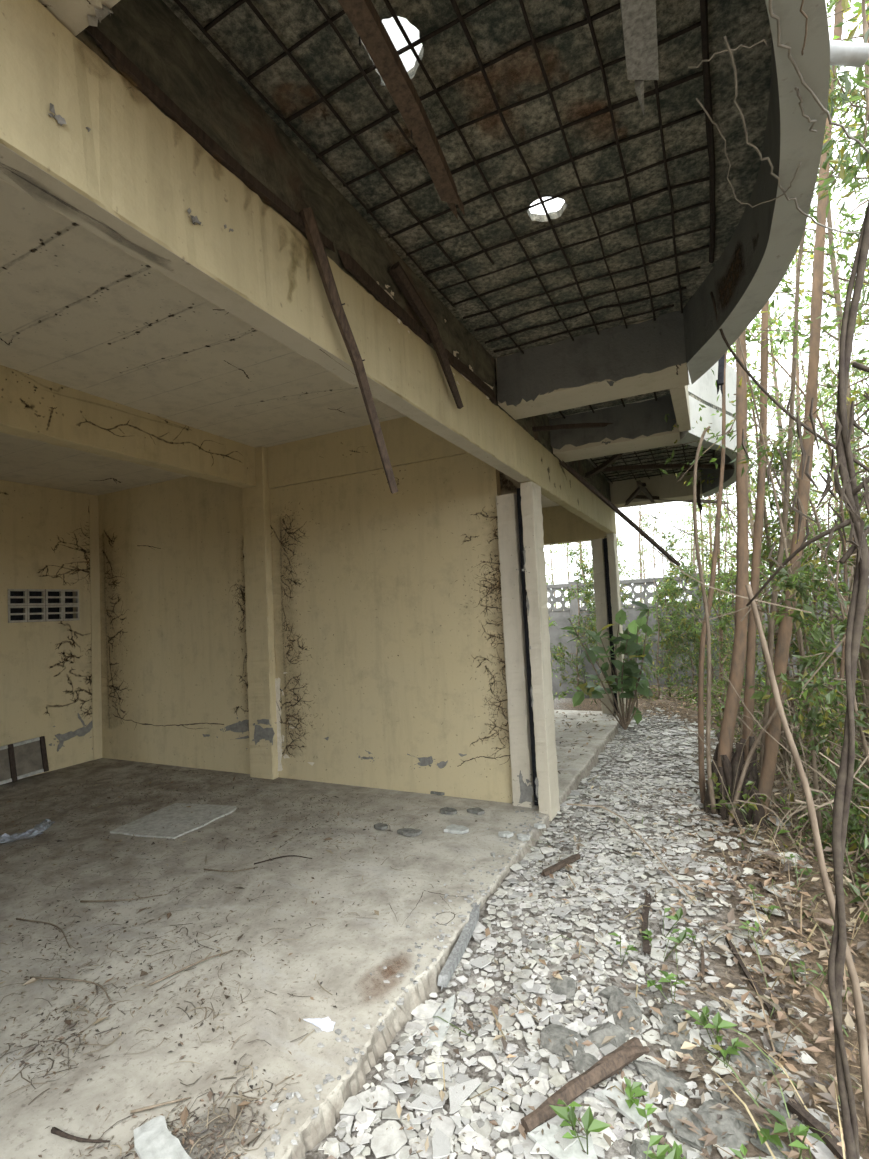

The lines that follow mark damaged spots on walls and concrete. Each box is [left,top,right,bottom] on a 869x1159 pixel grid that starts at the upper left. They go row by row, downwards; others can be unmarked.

peeling [87,4,113,27]
spalling [174,0,716,406]
damp [88,239,153,302]
spalling [549,392,715,484]
peeling [49,713,93,752]
peeling [203,672,294,771]
peeling [407,753,467,769]